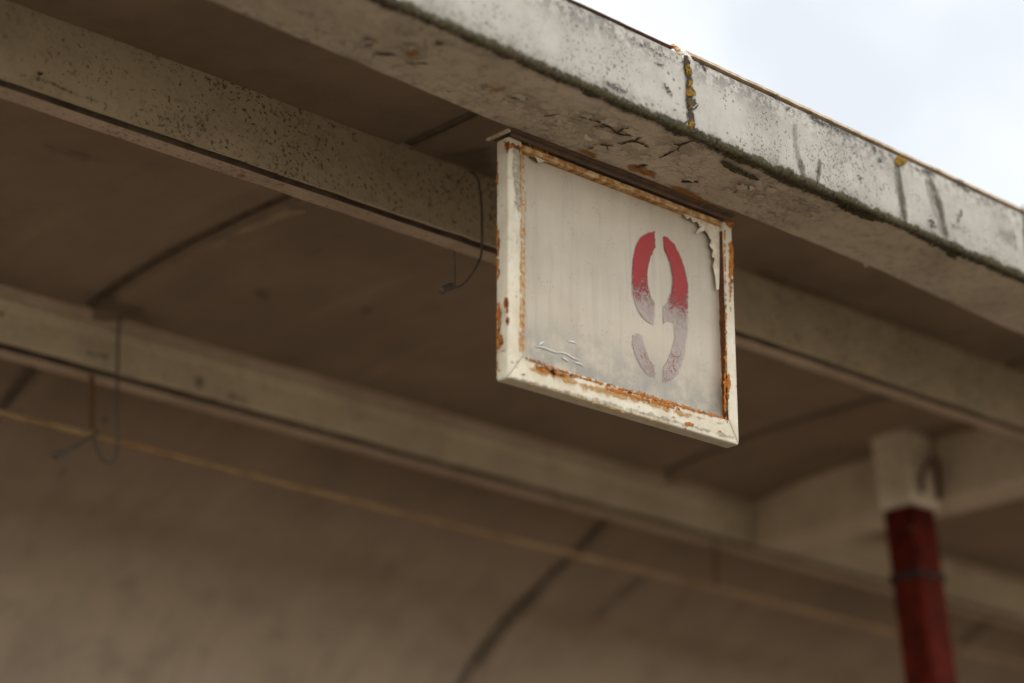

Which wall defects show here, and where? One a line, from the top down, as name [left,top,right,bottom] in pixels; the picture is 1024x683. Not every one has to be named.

crack [509,56,707,168]
water stain [808,114,857,137]
water stain [897,165,907,223]
water stain [916,167,971,238]